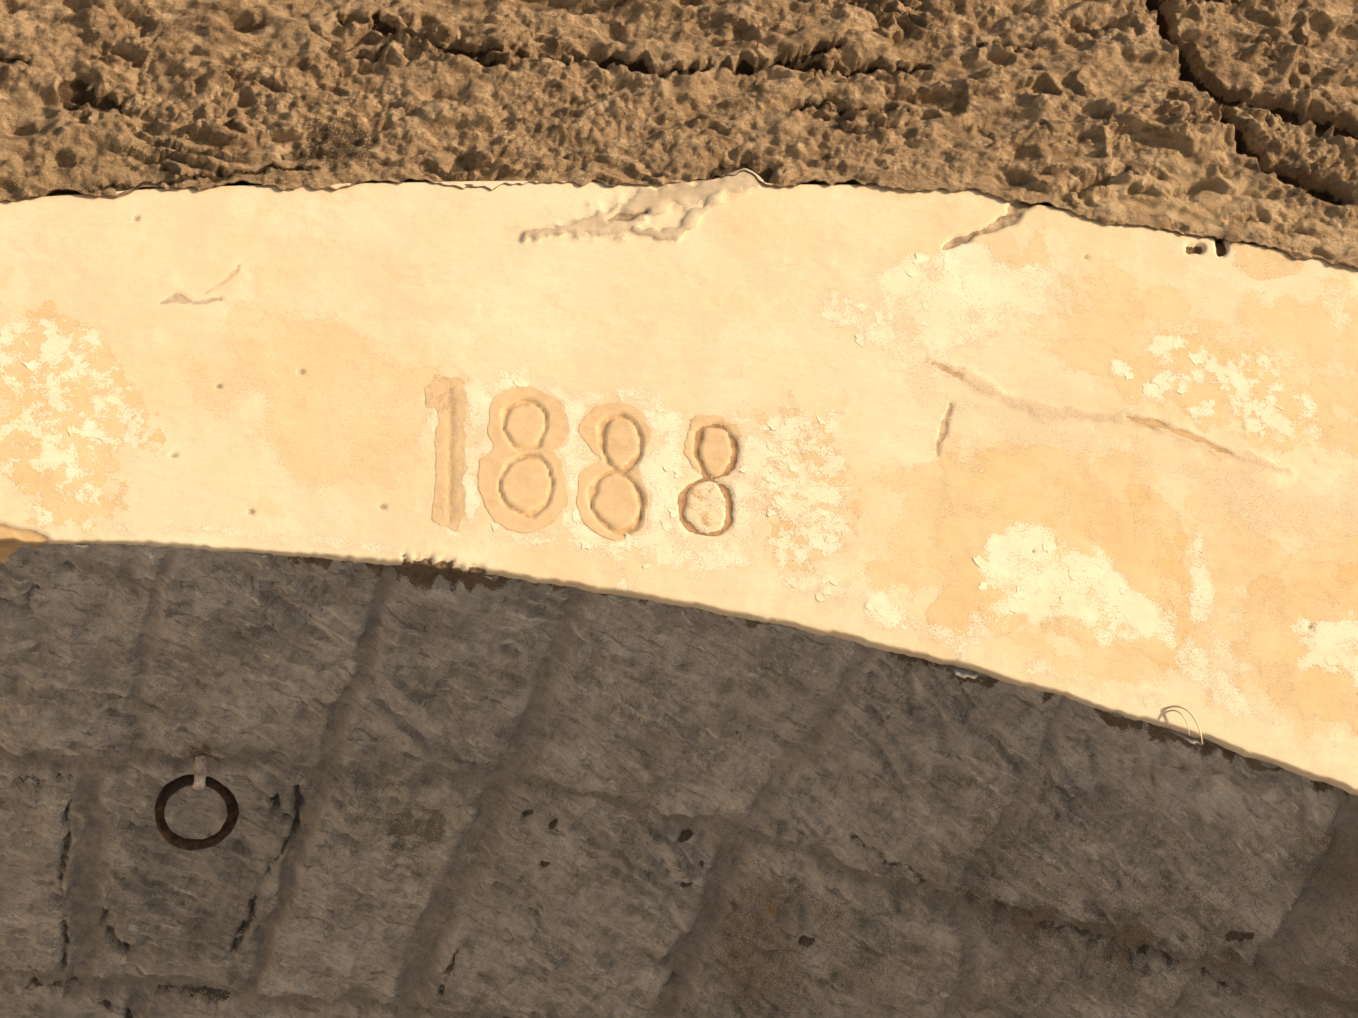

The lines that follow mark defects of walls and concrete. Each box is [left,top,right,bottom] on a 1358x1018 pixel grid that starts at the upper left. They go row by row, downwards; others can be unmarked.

crack [1145,0,1358,206]
peeling [809,234,1060,363]
peeling [0,299,177,563]
crack [931,362,963,457]
crack [1126,416,1232,455]
peeling [1097,322,1334,466]
peeling [402,361,1358,734]